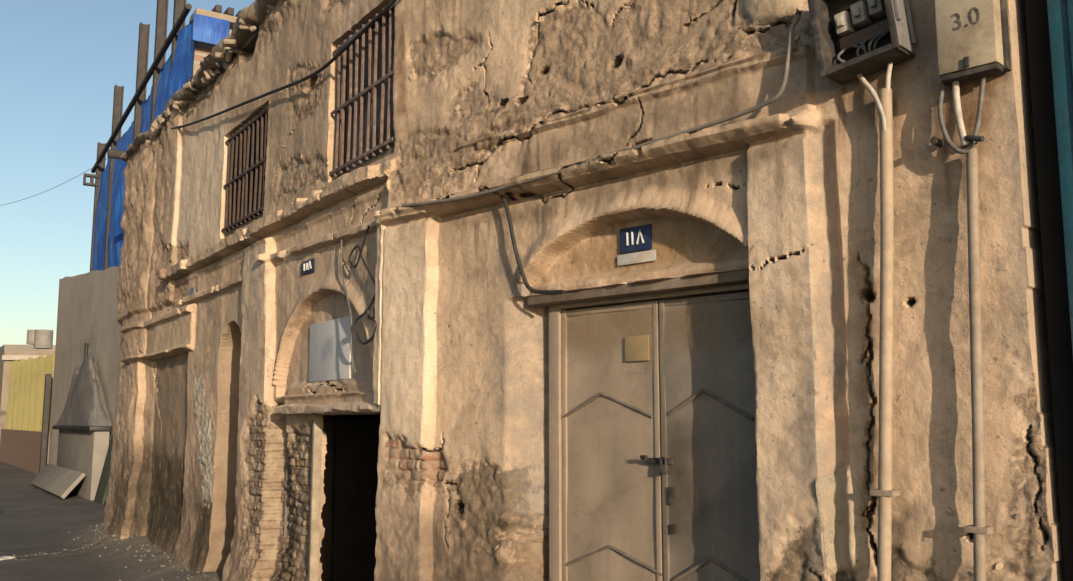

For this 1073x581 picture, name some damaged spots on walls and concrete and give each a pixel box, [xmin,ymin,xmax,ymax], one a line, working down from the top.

crack [533,0,634,57]
crack [690,0,801,34]
crack [436,59,729,203]
spalling [388,0,813,210]
crack [752,244,814,270]
damp [112,454,182,539]
flaking render [193,374,215,509]
spalling [235,400,313,581]
spalling [383,437,549,581]
crack [859,256,878,565]
crack [1026,427,1048,548]